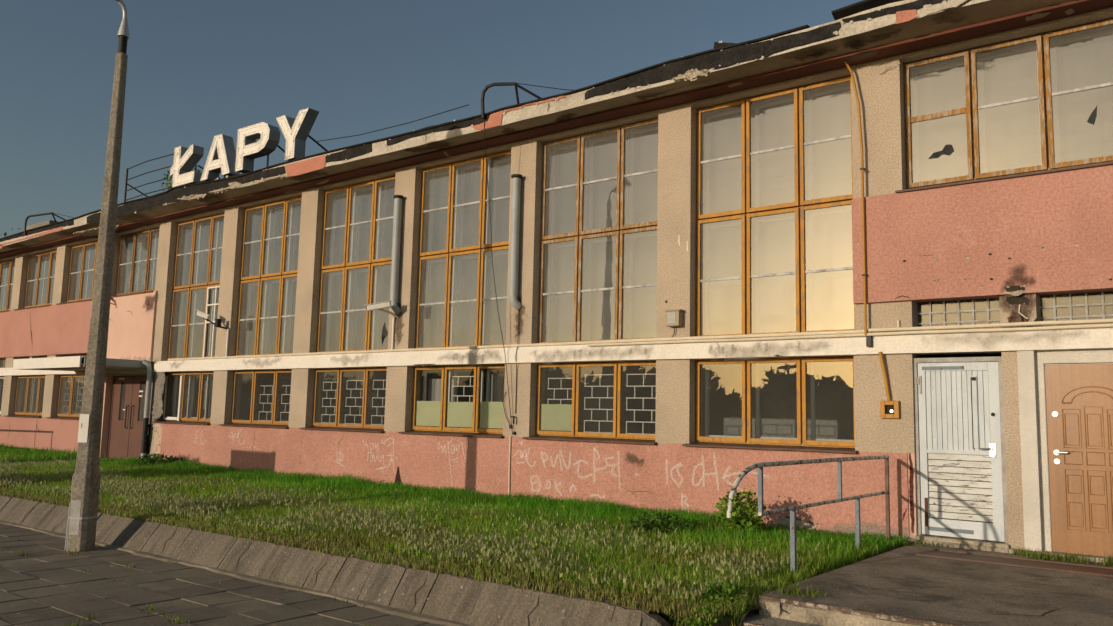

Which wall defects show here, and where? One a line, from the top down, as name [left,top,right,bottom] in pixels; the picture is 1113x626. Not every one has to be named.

peeling [583,0,970,100]
peeling [386,96,565,147]
peeling [325,143,372,163]